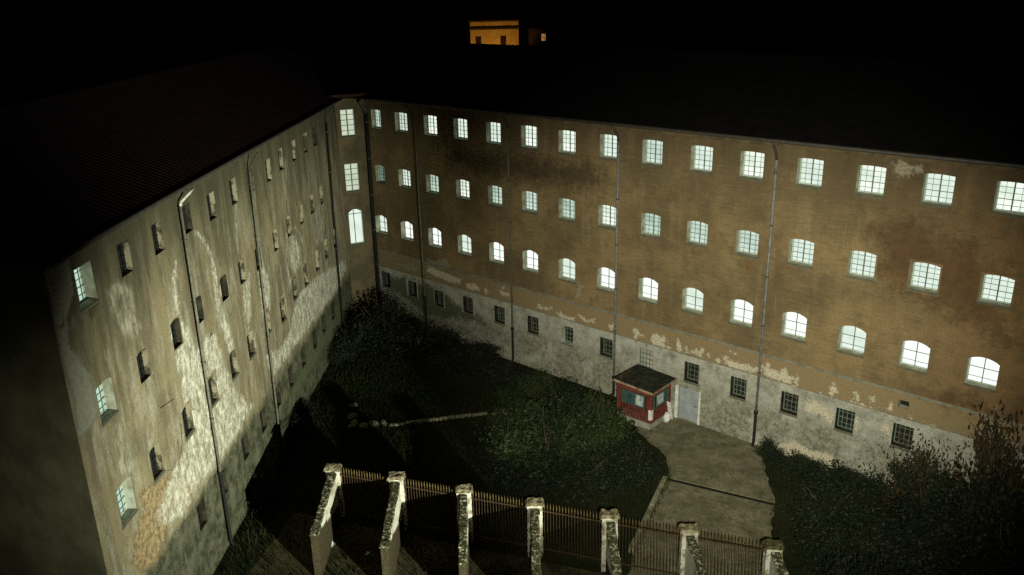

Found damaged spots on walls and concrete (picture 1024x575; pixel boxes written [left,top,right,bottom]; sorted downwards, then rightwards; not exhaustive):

spalling [888,159,925,178]
water stain [109,283,138,339]
efflorescence [243,266,270,329]
water stain [266,196,351,406]
peeling [427,266,510,297]
efflorescence [157,232,252,525]
peeling [633,327,799,387]
peeling [850,391,894,435]
water stain [112,424,135,475]